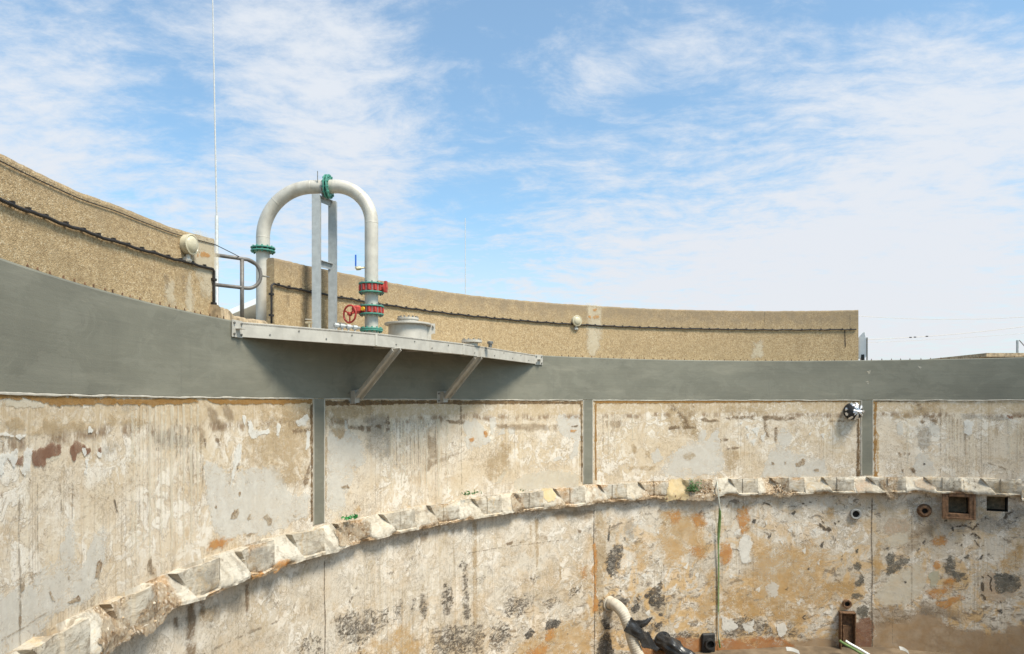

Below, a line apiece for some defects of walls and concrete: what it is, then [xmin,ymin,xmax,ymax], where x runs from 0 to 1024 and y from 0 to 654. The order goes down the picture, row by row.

peeling [0,426,102,476]
peeling [230,415,281,496]
peeling [296,414,310,450]
mould [334,588,428,654]
water stain [432,549,580,654]
mould [604,525,626,577]
peeling [734,526,793,598]
water stain [841,540,1024,654]
spalling [980,570,1021,603]